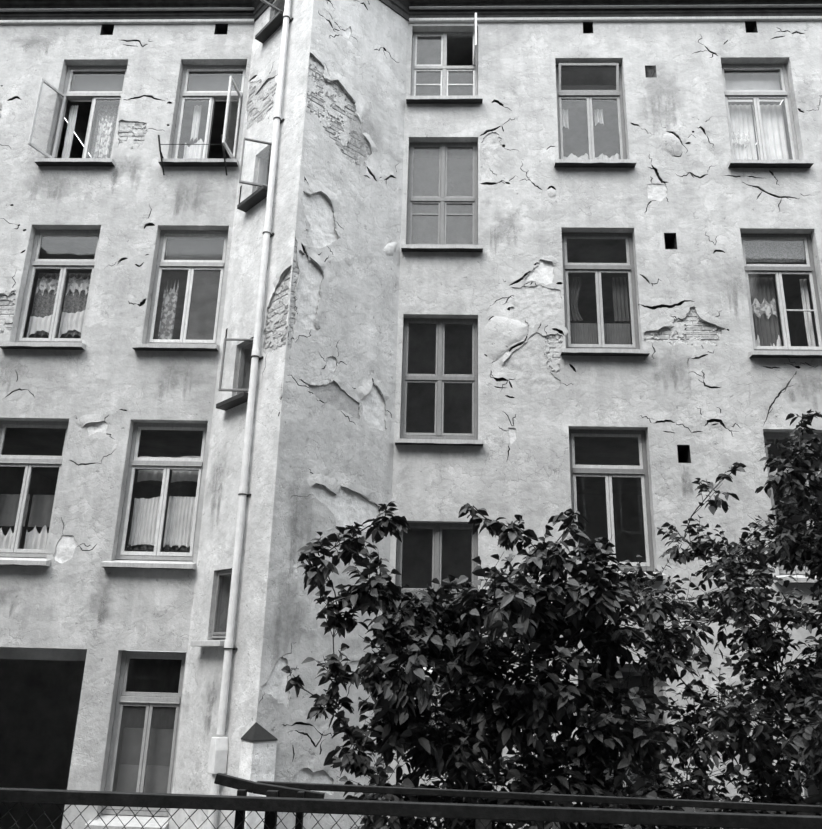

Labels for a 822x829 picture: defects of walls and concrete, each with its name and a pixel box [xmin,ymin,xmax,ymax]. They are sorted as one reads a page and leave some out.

crack [694,34,728,58]
spalling [246,66,278,130]
spalling [306,46,380,181]
crack [475,96,515,147]
crack [630,117,808,211]
spalling [262,176,342,375]
spalling [490,255,580,398]
spalling [638,293,730,357]
spalling [291,342,392,431]
crack [642,345,818,435]
spalling [293,469,385,535]
spalling [260,644,297,708]